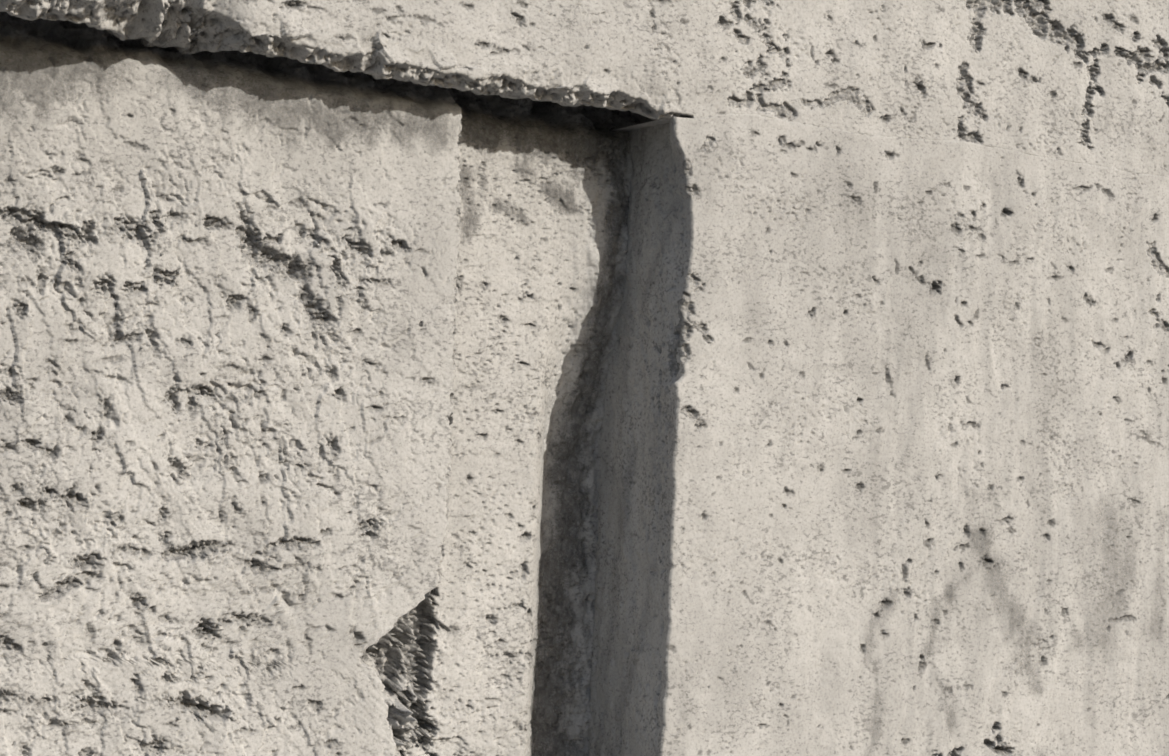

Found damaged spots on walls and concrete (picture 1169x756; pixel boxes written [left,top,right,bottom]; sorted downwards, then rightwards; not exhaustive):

spalling [360,590,435,756]